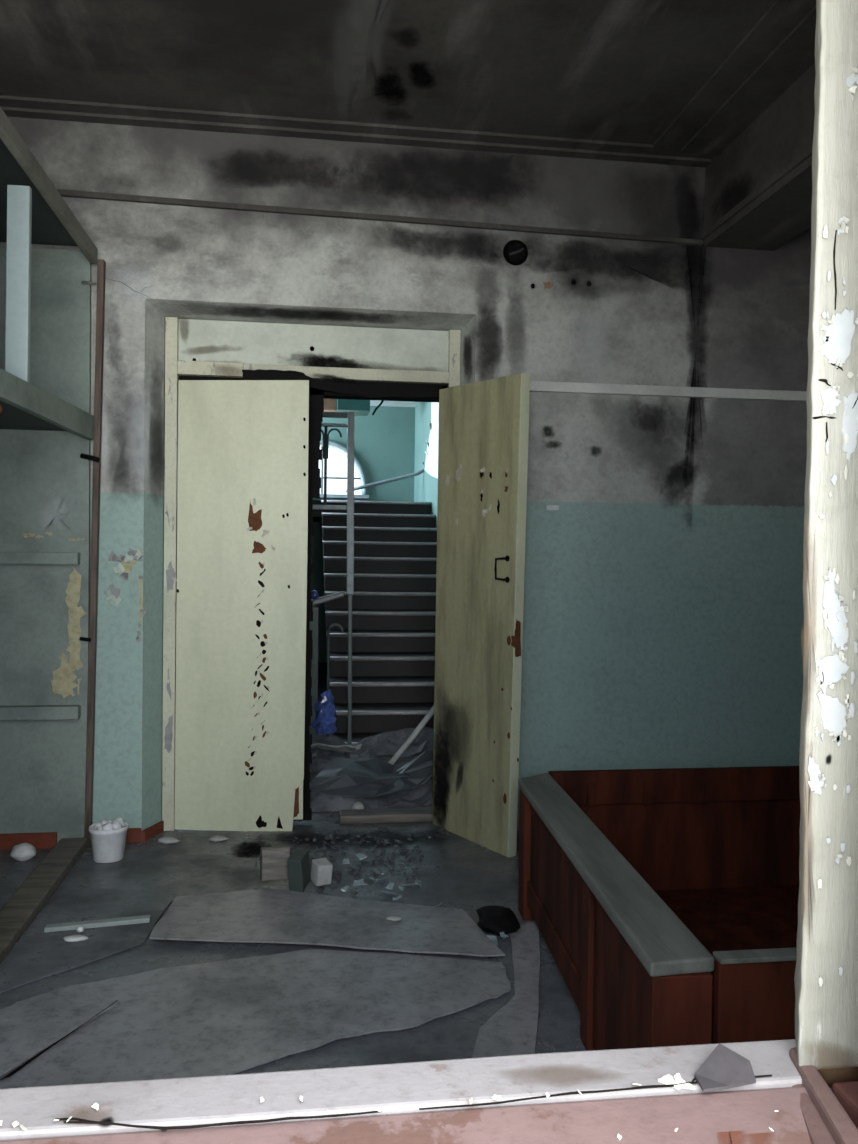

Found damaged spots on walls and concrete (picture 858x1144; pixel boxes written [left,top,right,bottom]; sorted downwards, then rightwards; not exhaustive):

peeling [846,66,858,101]
peeling [822,215,850,239]
damp [299,355,363,382]
peeling [818,270,858,497]
damp [668,463,692,493]
peeling [104,547,147,642]
peeling [807,567,858,796]
peeling [826,837,851,866]
crack [419,1081,698,1110]
crack [55,1110,381,1130]